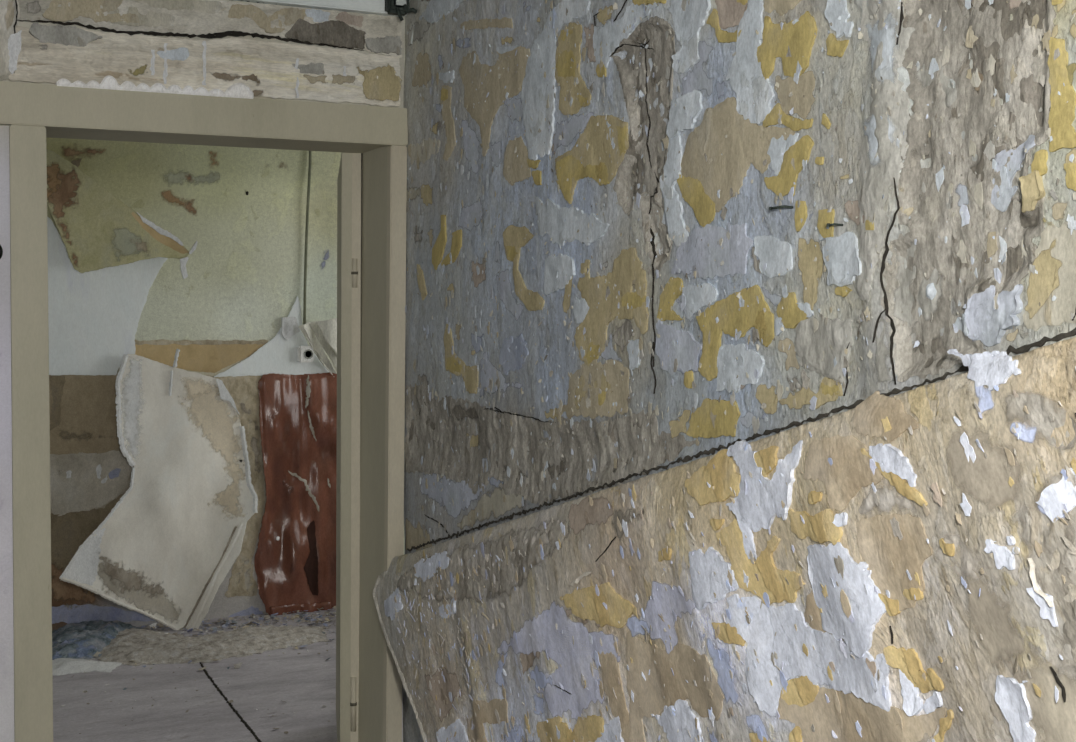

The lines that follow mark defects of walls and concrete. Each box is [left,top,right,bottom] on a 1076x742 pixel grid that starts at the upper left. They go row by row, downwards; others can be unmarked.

peeling [8,30,22,74]
crack [13,0,364,51]
crack [896,2,904,45]
peeling [49,374,155,624]
flaking render [206,375,265,617]
crack [483,407,556,423]
crack [593,0,659,394]
flaking render [394,0,1076,742]
crack [843,177,900,396]
crack [200,662,262,742]